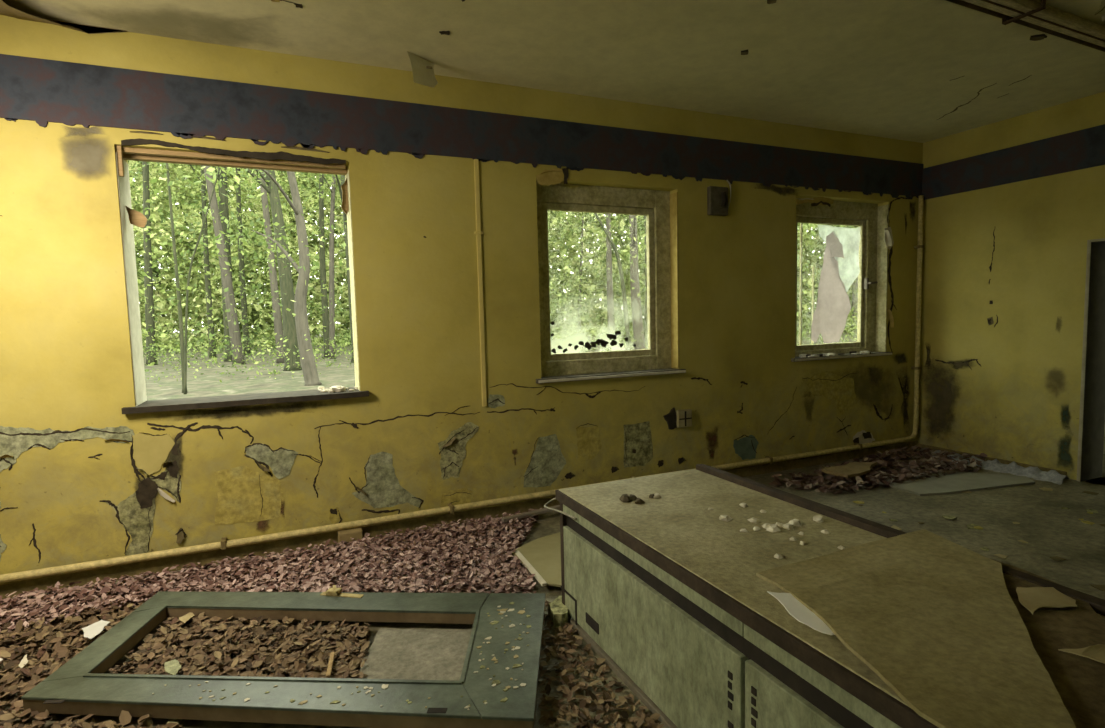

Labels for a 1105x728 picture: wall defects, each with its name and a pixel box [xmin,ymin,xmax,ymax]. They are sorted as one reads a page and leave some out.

peeling [121,131,346,164]
crack [147,423,254,444]
peeling [437,422,479,480]
crack [309,383,645,498]
peeling [611,421,664,473]
spalling [0,422,198,556]
peeling [349,452,424,514]
crack [29,523,41,563]